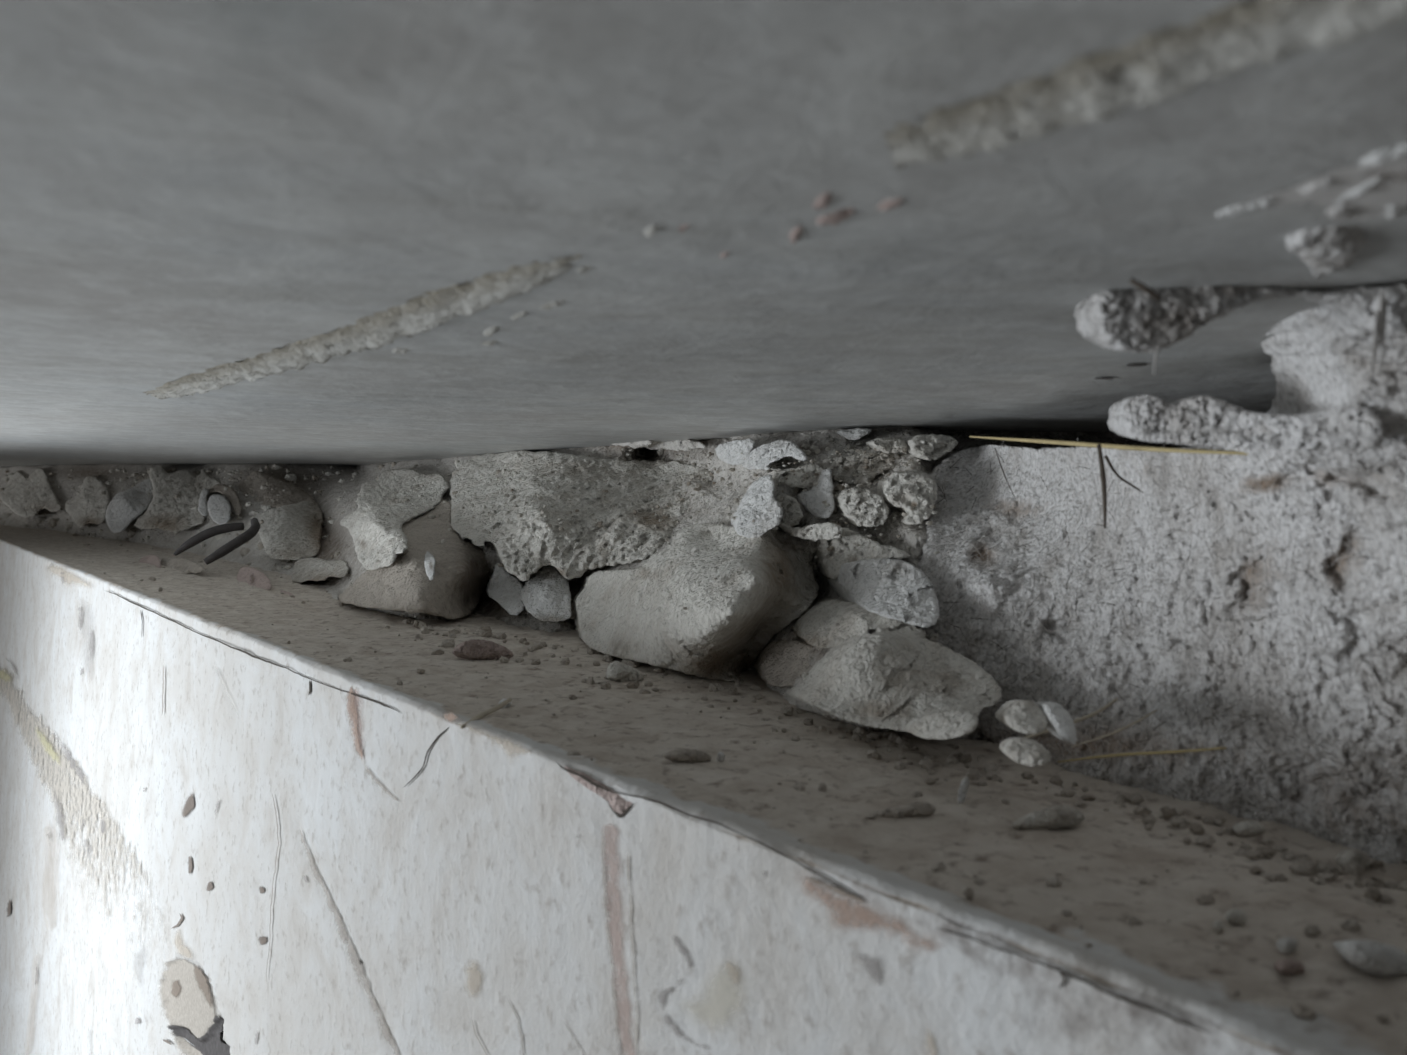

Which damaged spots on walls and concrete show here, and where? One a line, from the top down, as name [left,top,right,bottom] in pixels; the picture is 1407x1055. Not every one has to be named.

peeling [424,551,436,581]
flaking render [564,766,632,814]
spalling [160,914,230,1055]